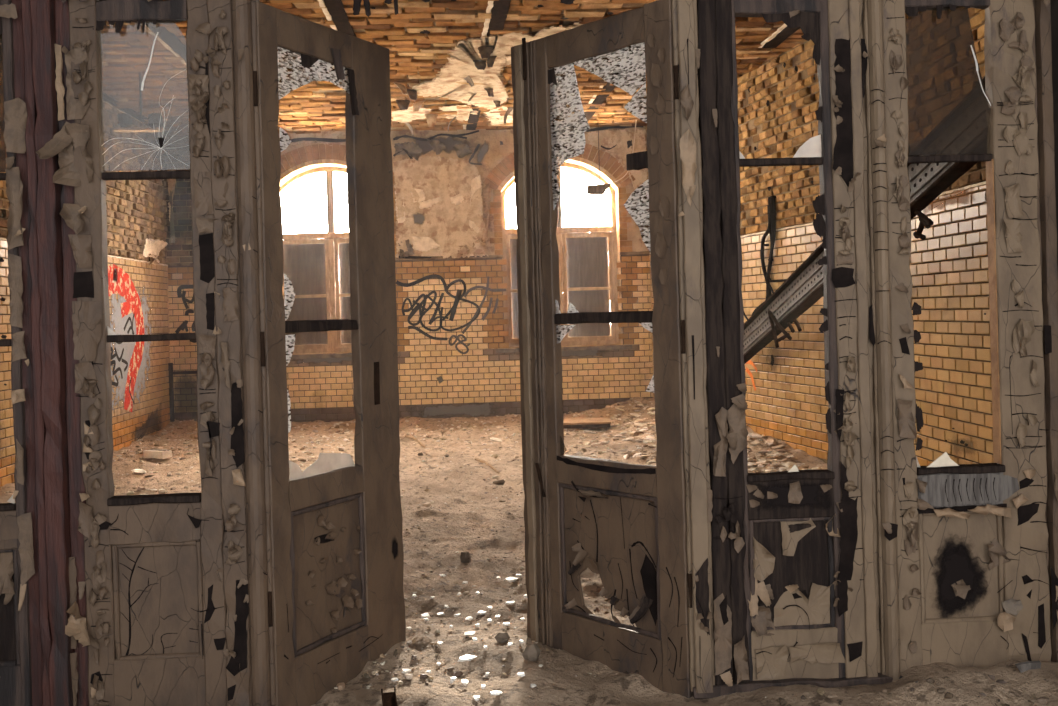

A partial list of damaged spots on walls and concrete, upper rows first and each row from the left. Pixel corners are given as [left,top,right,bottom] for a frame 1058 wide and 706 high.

peeling [0,18,157,366]
flaking render [391,0,583,259]
peeling [762,10,821,80]
peeling [815,38,869,192]
peeling [713,383,749,477]
peeling [825,364,845,441]
peeling [896,283,924,451]
peeling [0,512,35,611]
crack [120,547,199,656]
peeling [191,504,249,701]
crack [567,497,682,677]
peeling [693,461,863,686]